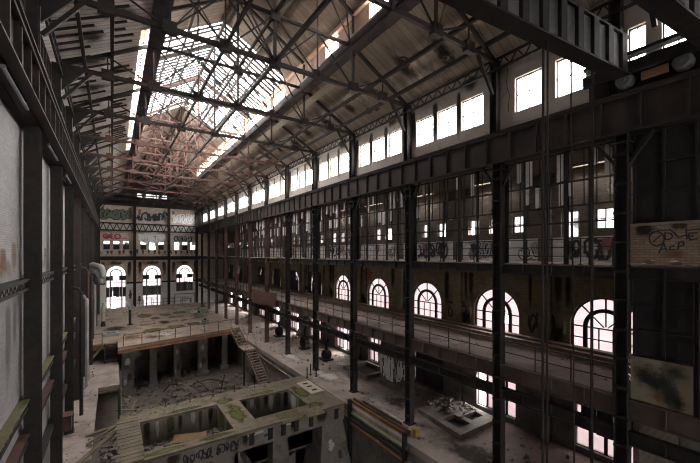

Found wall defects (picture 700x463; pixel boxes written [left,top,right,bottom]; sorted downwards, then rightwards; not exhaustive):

damp [634,365,684,412]